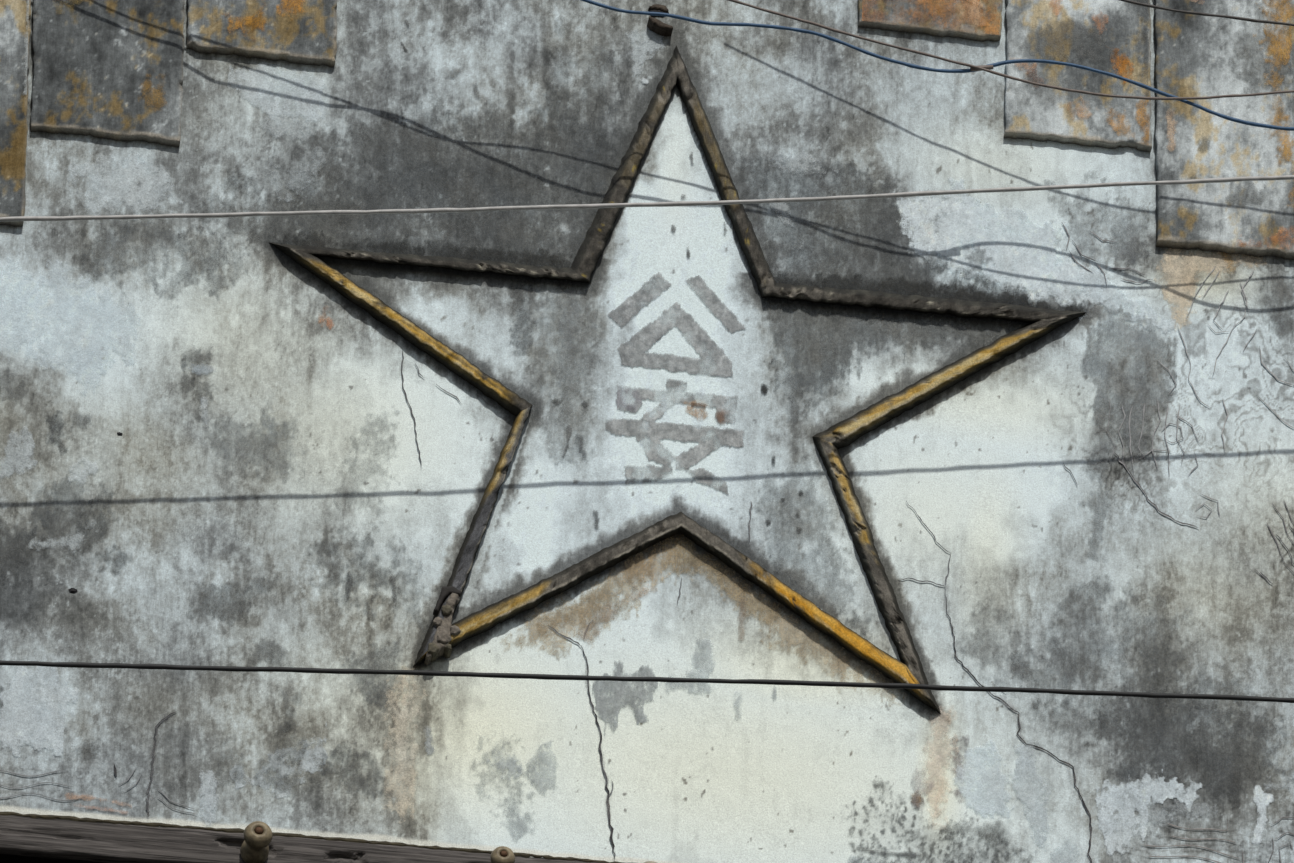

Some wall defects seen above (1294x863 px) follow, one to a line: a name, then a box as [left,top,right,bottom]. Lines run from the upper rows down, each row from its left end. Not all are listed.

corrosion [1263,0,1292,78]
water stain [273,110,618,267]
corrosion [1275,99,1294,163]
crack [401,352,423,466]
crack [1115,453,1198,528]
water stain [318,536,400,604]
water stain [321,675,418,814]
crack [548,621,615,859]
water stain [850,711,1022,863]
crack [902,501,1092,863]